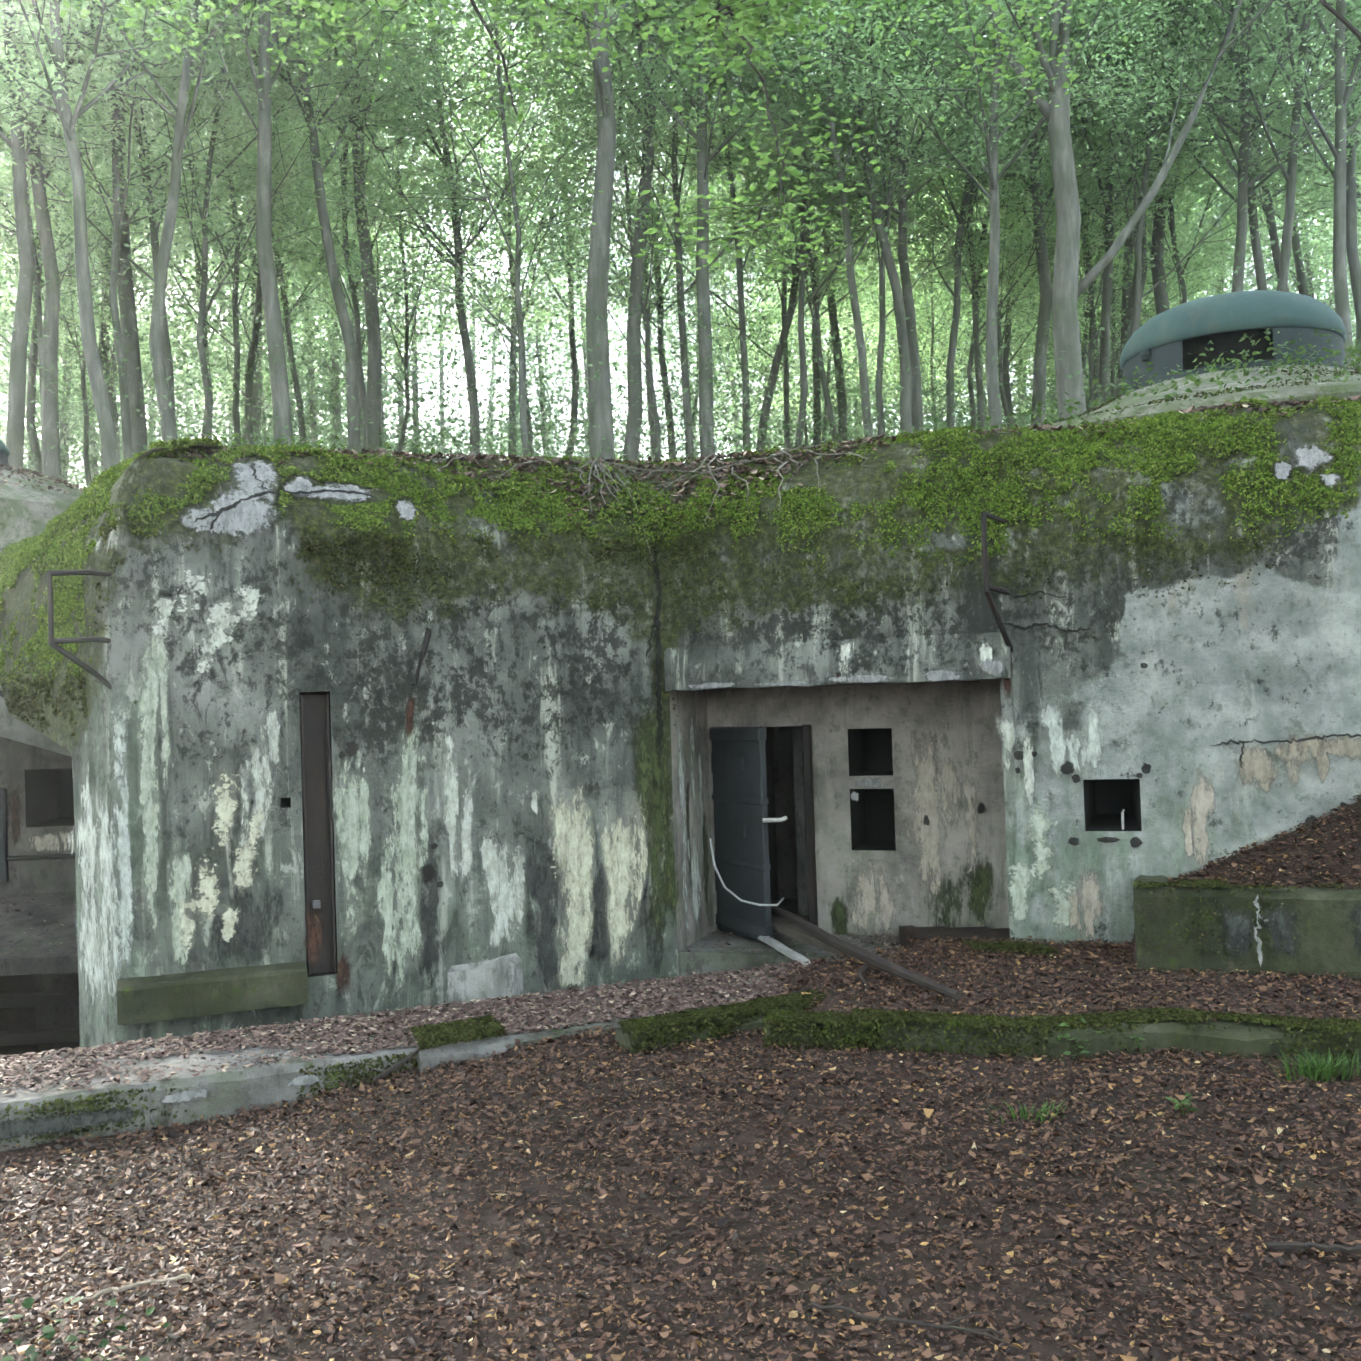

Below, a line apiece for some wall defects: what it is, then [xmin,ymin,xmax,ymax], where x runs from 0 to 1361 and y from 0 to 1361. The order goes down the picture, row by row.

spalling [181,460,380,540]
spalling [395,500,418,520]
spalling [1275,444,1340,487]
crack [1003,591,1089,633]
crack [1210,733,1361,768]
damp [239,709,281,871]
damp [27,628,192,1030]
damp [333,708,709,991]
damp [209,885,282,966]
corrosion [304,911,323,964]
crack [1253,894,1268,967]
corrosion [336,955,351,996]